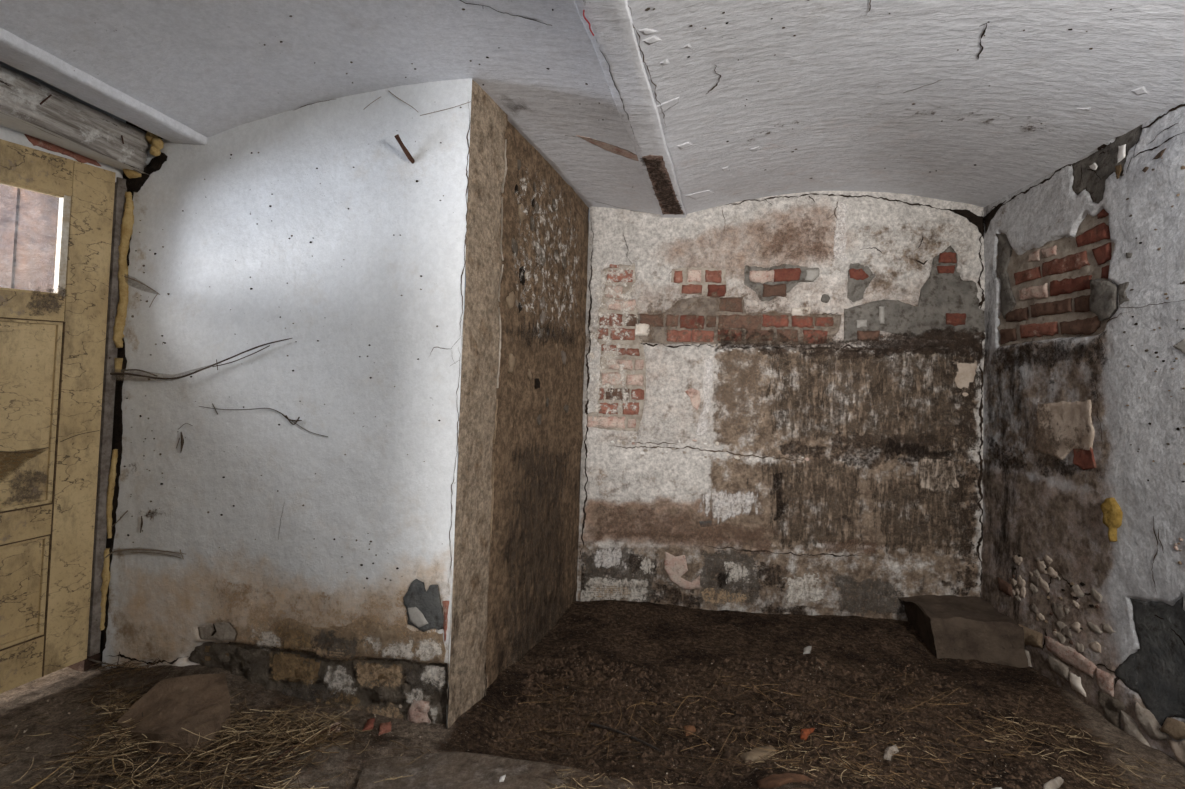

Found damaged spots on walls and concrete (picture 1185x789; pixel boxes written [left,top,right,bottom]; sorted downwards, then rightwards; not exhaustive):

crack [460,0,552,26]
spalling [460,120,470,333]
flaking render [490,139,567,543]
crack [579,218,594,581]
leakage [596,326,1107,596]
flaking render [587,125,1142,454]
crack [616,104,1185,597]
flaking render [251,601,449,664]
flaking render [580,546,760,607]
leakage [655,582,702,609]
leakage [761,604,807,615]
flaking render [1009,554,1115,653]